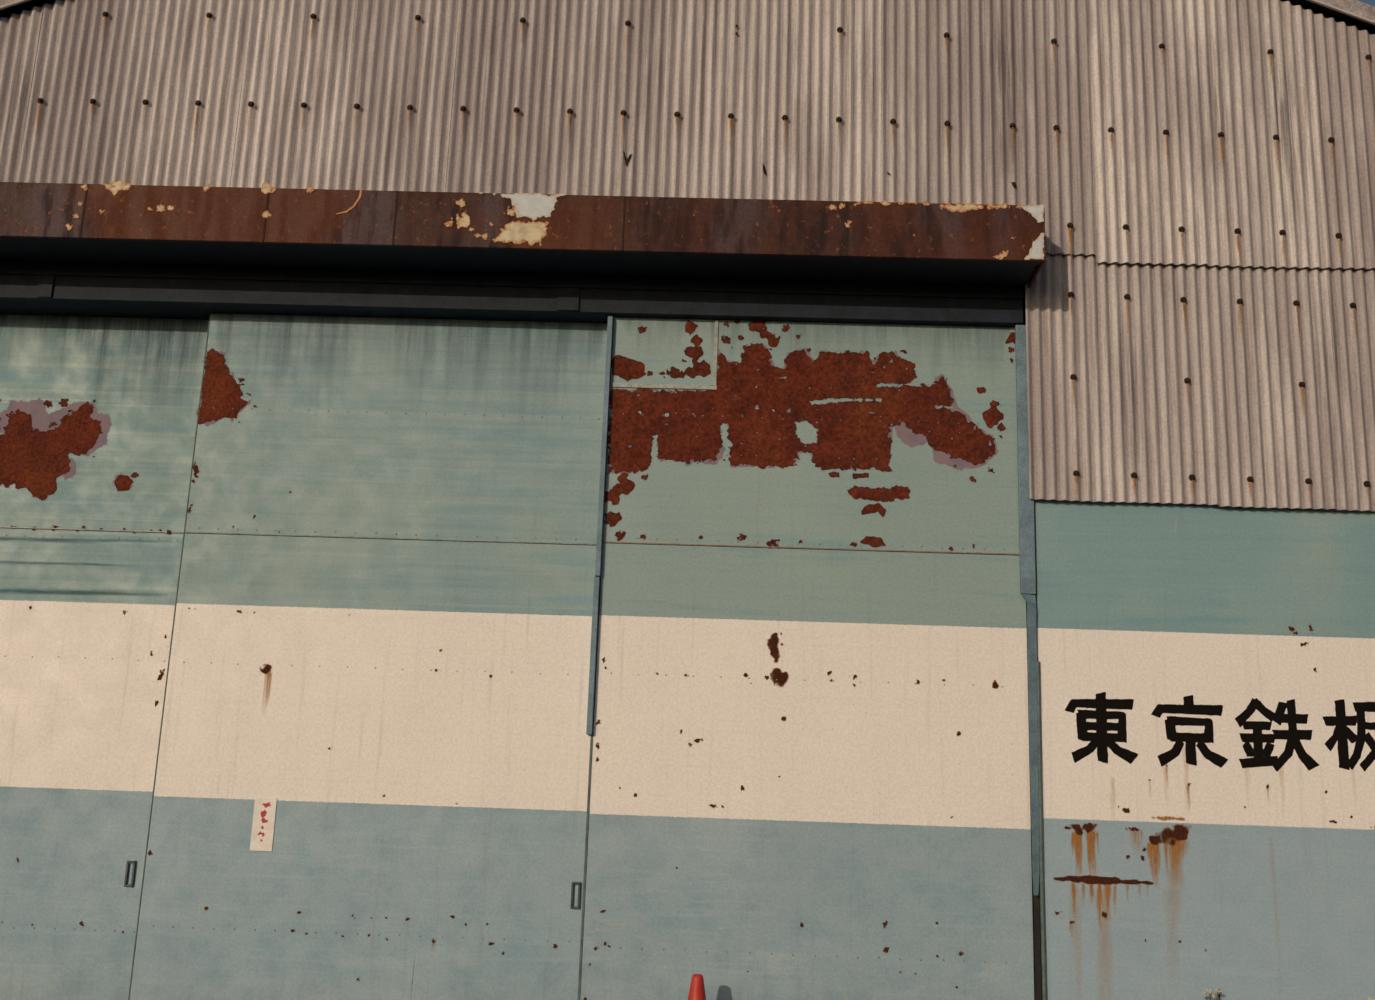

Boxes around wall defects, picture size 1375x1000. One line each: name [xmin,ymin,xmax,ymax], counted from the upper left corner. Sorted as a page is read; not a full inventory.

peeling [444,191,566,246]
corrosion [743,633,788,687]
corrosion [1054,806,1189,924]